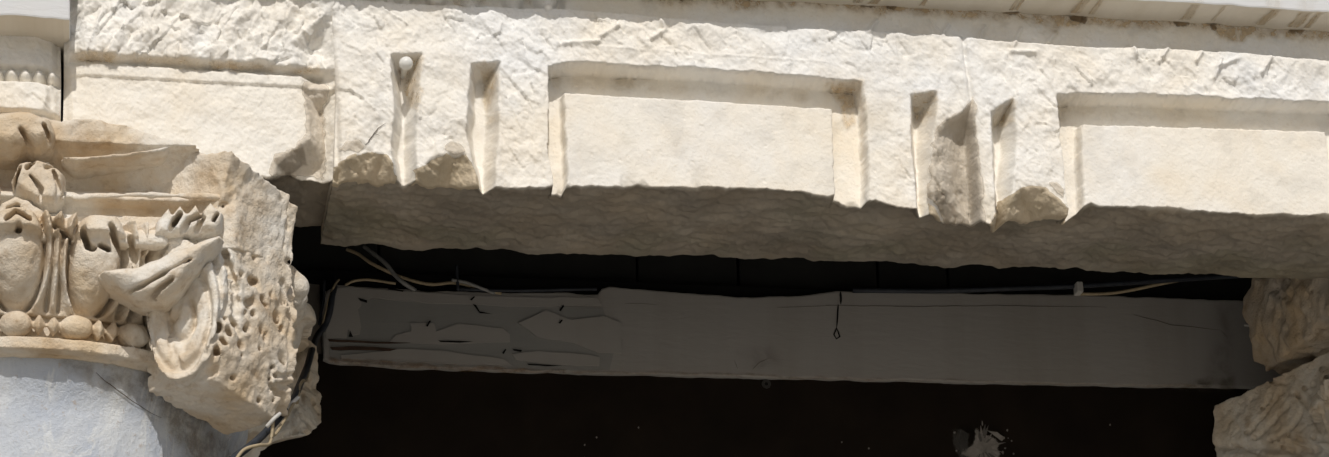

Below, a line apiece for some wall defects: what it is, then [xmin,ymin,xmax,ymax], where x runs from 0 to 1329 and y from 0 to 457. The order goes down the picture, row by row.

spalling [927,99,1069,233]
peeling [325,287,621,371]